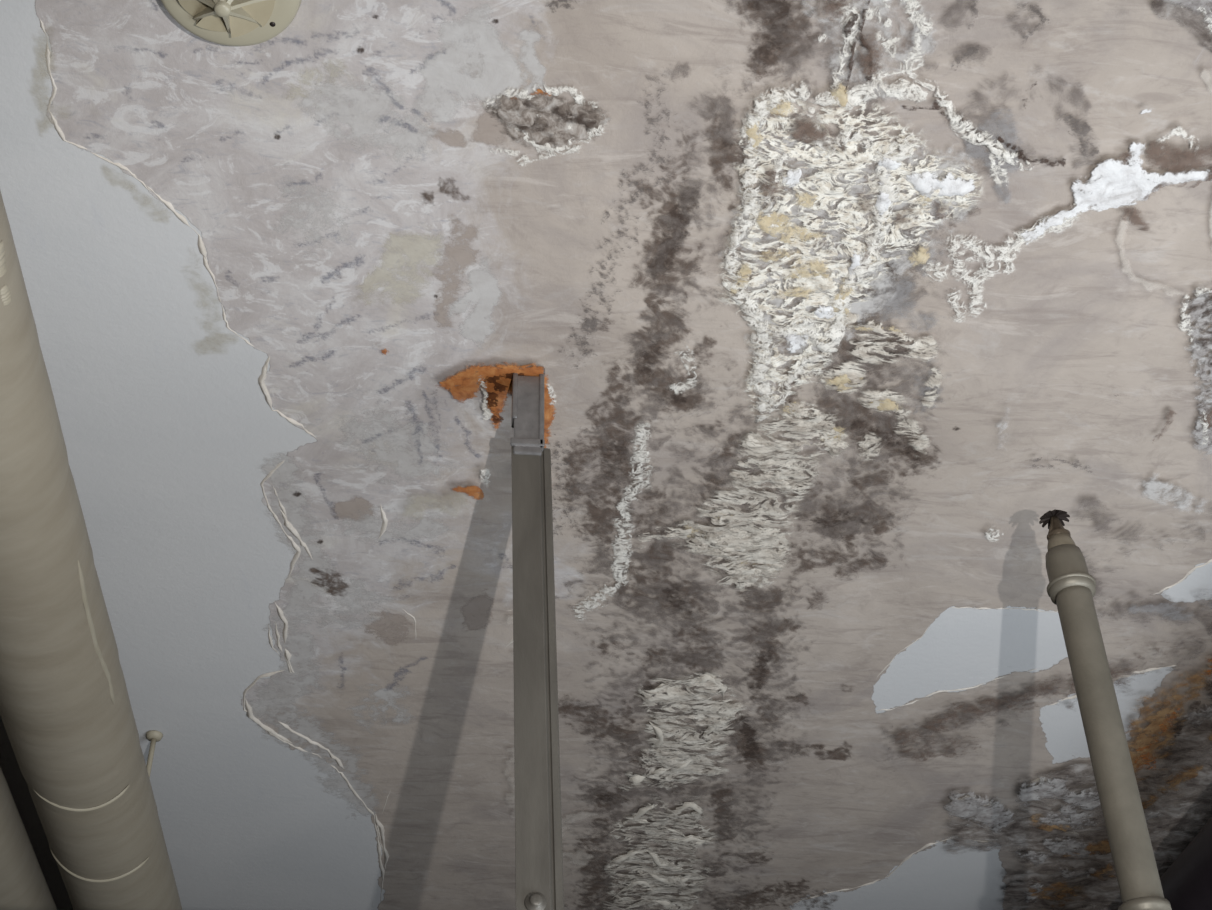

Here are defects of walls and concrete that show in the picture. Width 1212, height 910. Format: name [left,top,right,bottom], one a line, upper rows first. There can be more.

crack [844,0,873,94]
spalling [1153,0,1212,34]
spalling [486,86,611,159]
water stain [1051,84,1101,167]
peeling [785,184,903,270]
spalling [1179,288,1212,381]
corrosion [439,362,556,448]
spalling [1195,395,1212,420]
corrosion [452,468,491,500]
water stain [551,0,1077,910]
water stain [1143,478,1205,512]
corrosion [1125,659,1212,780]